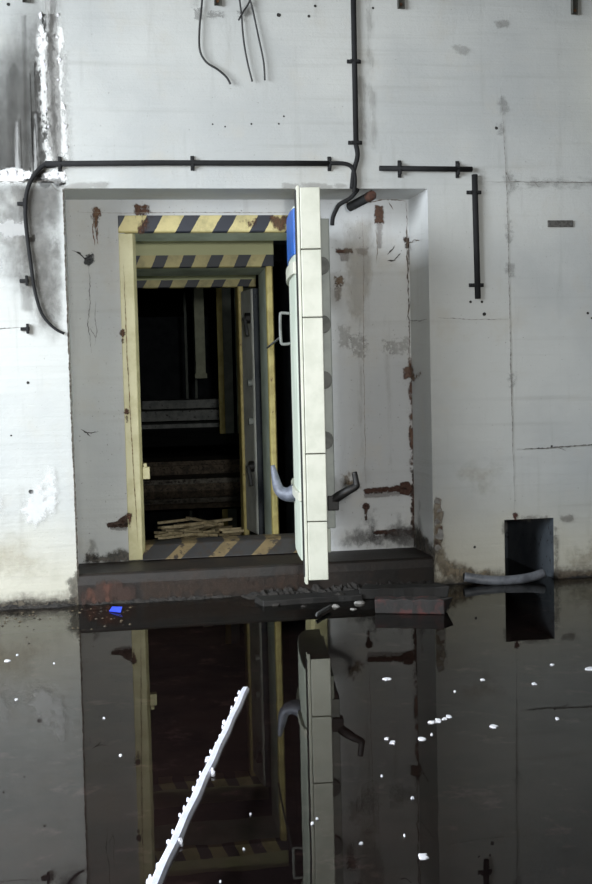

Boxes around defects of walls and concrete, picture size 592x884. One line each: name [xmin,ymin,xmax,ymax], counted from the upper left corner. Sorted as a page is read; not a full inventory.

water stain [0,168,68,184]
corrosion [92,207,101,235]
corrosion [134,204,150,234]
corrosion [270,215,288,231]
corrosion [370,191,384,223]
corrosion [362,360,421,538]
water stain [86,549,141,563]
water stain [0,572,79,607]